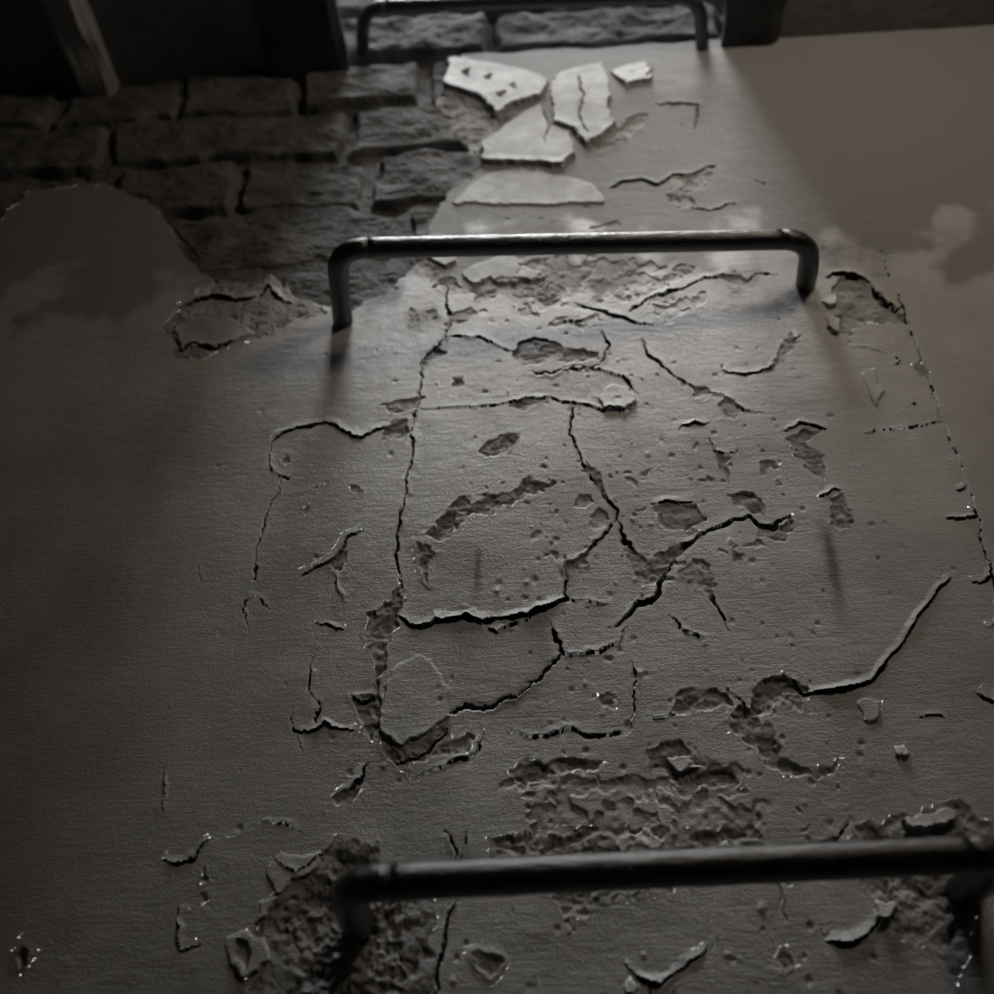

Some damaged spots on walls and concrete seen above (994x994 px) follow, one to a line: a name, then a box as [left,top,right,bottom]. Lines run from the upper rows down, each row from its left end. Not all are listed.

flaking render [0,55,704,311]
crack [577,262,801,420]
peeling [822,268,911,351]
crack [880,249,994,588]
crack [241,288,795,779]
peeling [970,561,994,585]
flaking render [646,573,951,780]
flaking render [225,834,440,994]
flaking render [551,888,674,921]
flaking render [487,821,764,858]
flaking render [825,875,986,984]
flaking render [847,797,994,841]